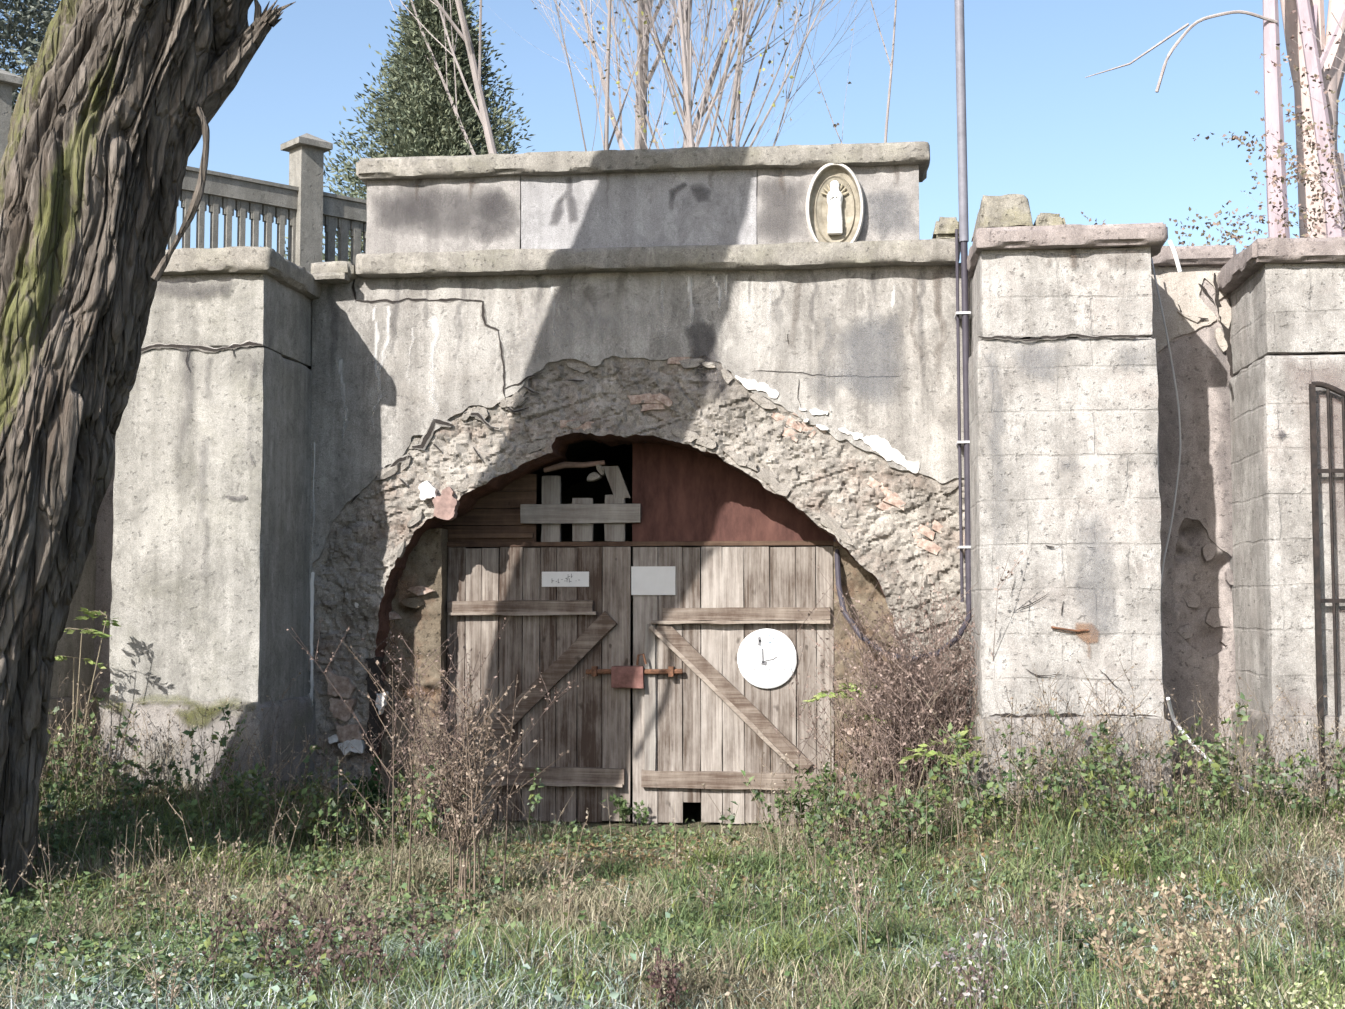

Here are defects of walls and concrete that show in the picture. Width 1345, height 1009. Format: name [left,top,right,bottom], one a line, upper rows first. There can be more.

water stain [554,197,575,222]
flaking render [1150,266,1231,353]
crack [978,333,1150,343]
crack [141,340,263,371]
crack [351,279,584,486]
spalling [312,356,970,815]
corrosion [1058,624,1098,642]